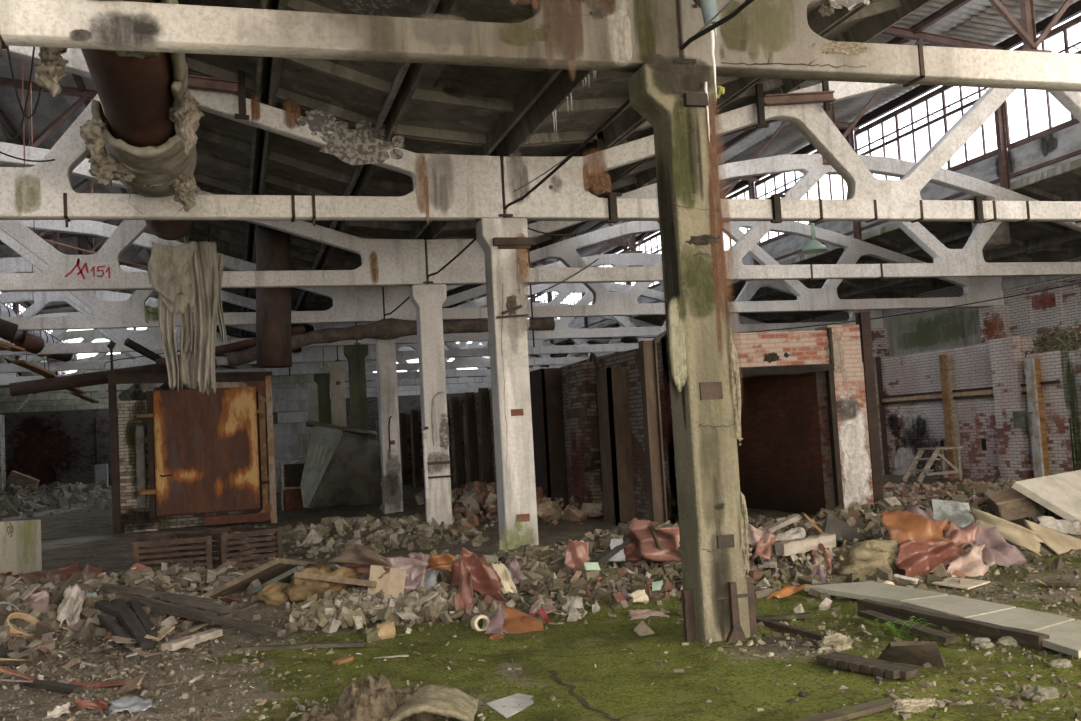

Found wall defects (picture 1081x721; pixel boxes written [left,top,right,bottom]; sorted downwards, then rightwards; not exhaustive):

damp [71,15,160,48]
peeling [297,106,405,166]
corrosion [417,155,429,222]
corrosion [583,151,611,193]
damp [659,149,687,428]
crack [454,649,662,721]